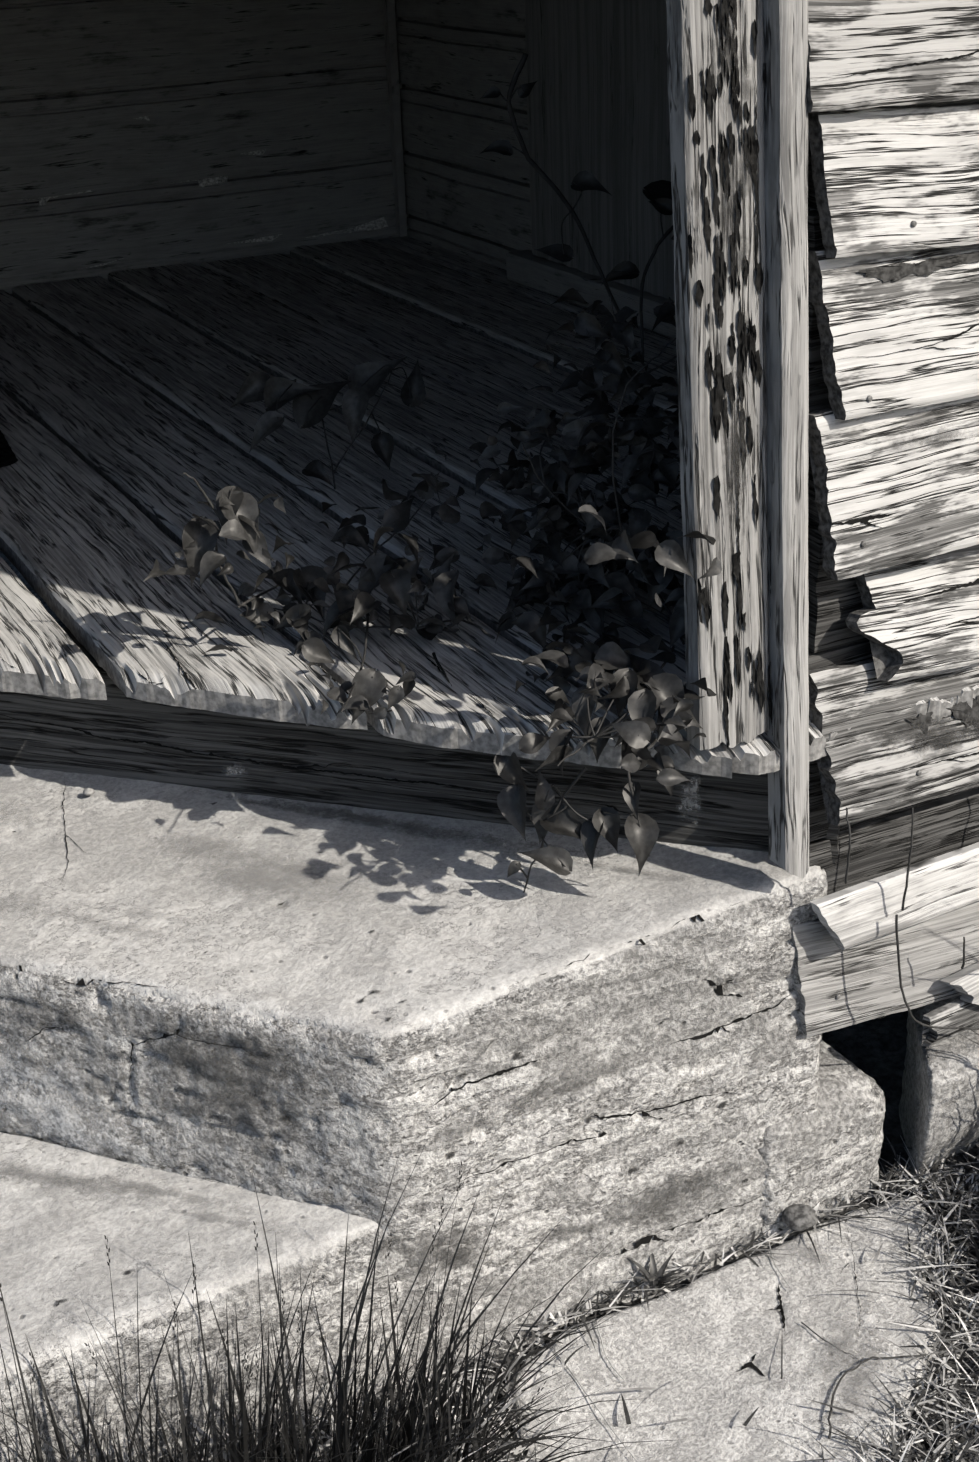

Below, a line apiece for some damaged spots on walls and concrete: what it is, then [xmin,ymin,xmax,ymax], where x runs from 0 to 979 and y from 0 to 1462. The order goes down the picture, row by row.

peeling [686,0,771,594]
crack [837,323,979,360]
peeling [697,552,773,749]
peeling [906,695,979,734]